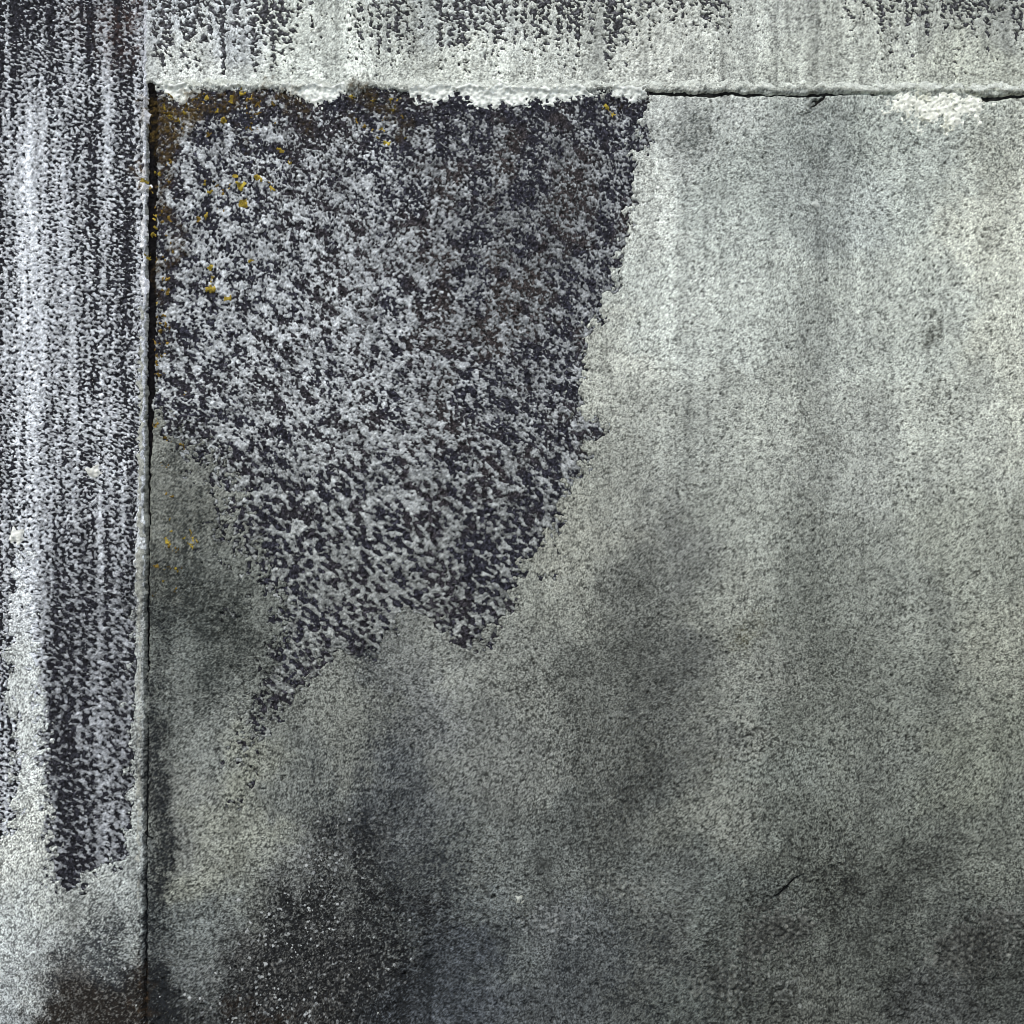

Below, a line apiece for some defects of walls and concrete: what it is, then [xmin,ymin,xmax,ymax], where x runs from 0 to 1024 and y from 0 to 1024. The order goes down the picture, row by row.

crack [649,92,876,108]
crack [977,94,1024,102]
leakage [148,442,256,713]
peeling [0,0,742,895]
leakage [36,676,459,1024]